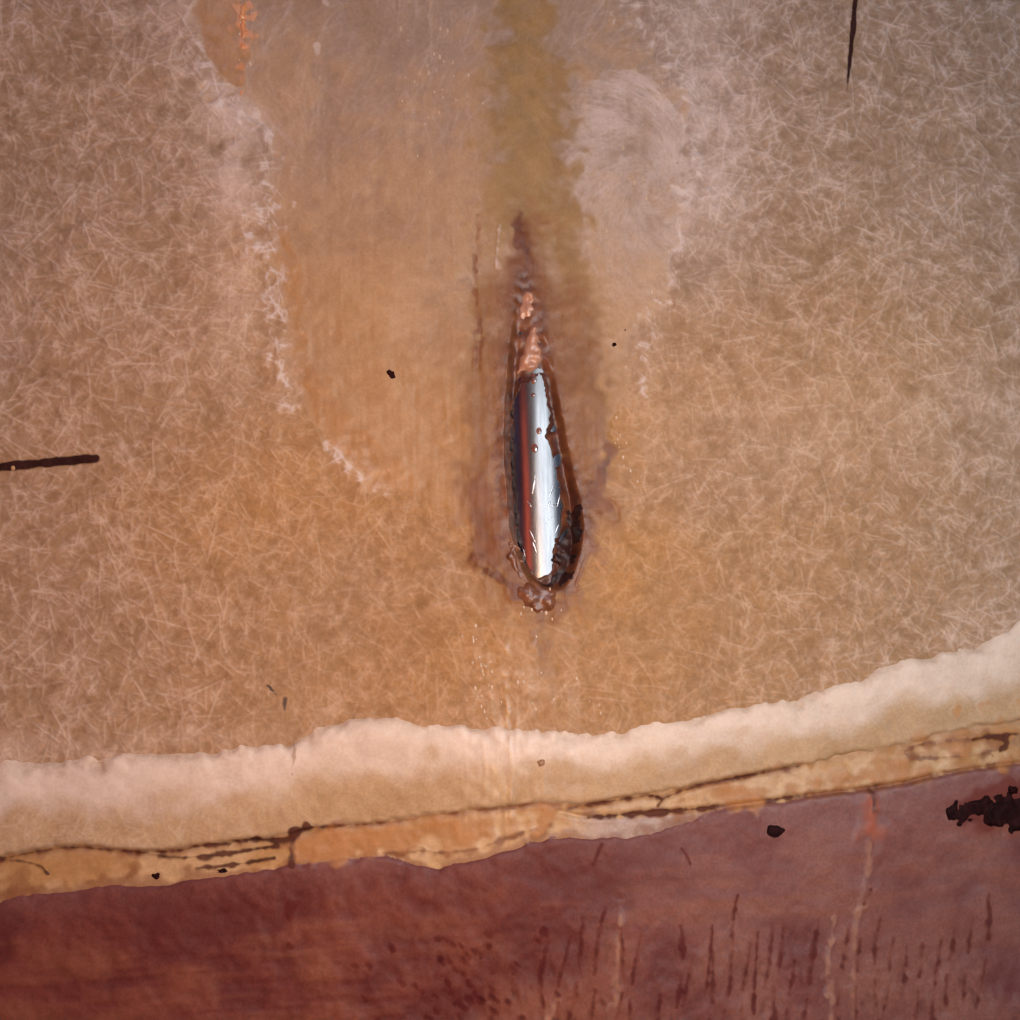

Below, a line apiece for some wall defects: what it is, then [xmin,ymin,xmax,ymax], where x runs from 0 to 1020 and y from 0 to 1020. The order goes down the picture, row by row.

peeling [176,0,468,514]
rust [423,161,653,647]
hole [486,258,601,613]
peeling [565,0,717,405]